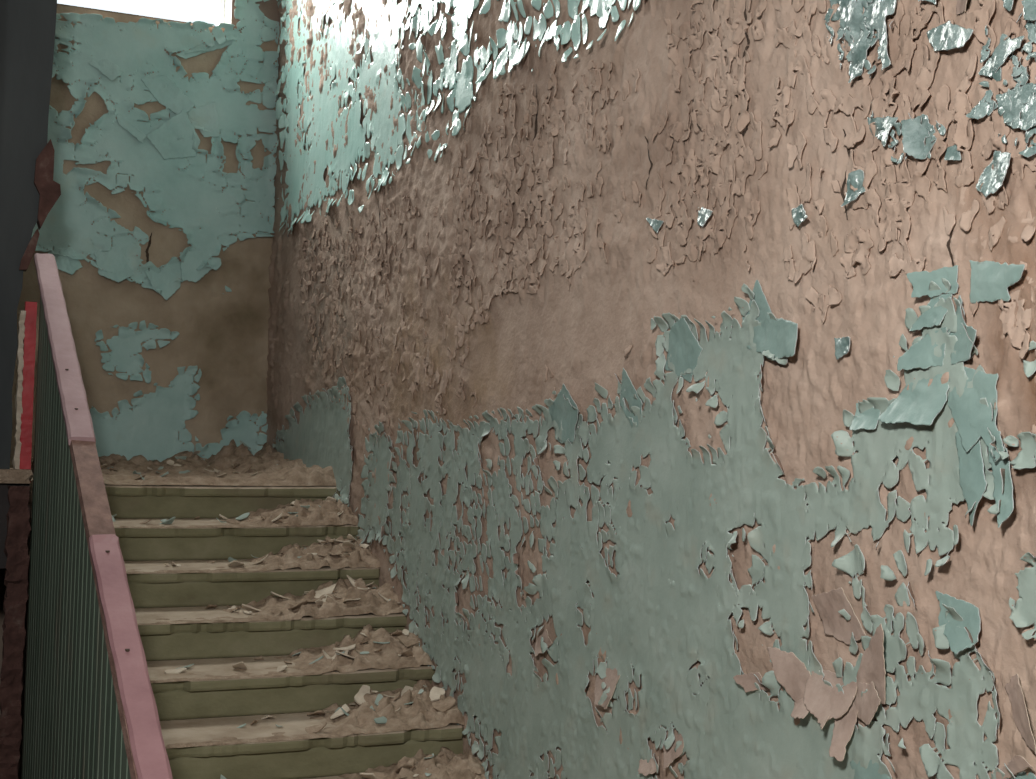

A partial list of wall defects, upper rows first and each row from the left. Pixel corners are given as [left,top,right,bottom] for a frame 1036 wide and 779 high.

flaking render [56,5,145,23]
flaking render [171,46,228,80]
flaking render [49,74,78,114]
flaking render [68,91,109,145]
flaking render [134,101,166,118]
flaking render [63,160,111,175]
flaking render [194,129,212,154]
flaking render [221,138,241,173]
flaking render [84,182,192,268]
flaking render [10,228,49,469]
peeling [95,320,179,383]
flaking render [944,764,960,779]